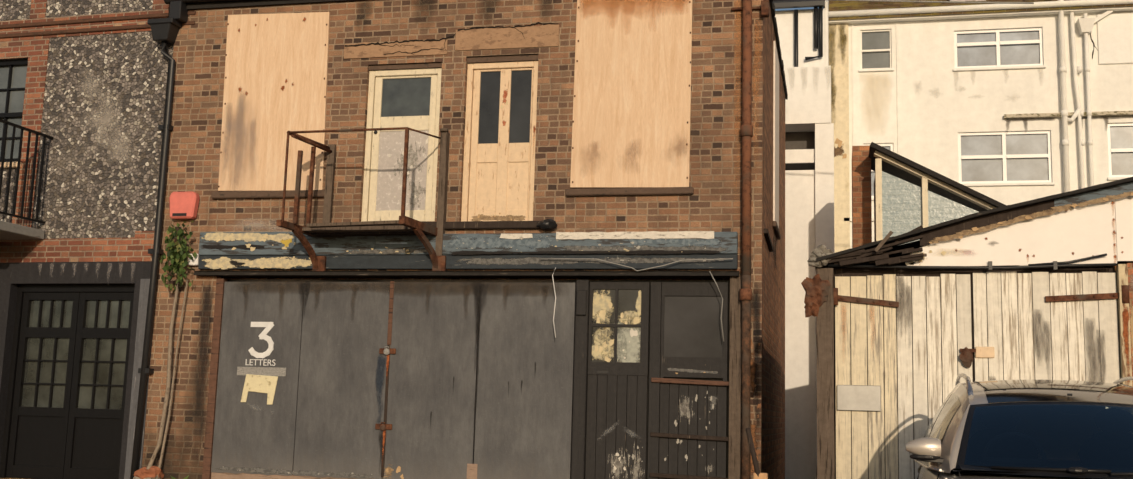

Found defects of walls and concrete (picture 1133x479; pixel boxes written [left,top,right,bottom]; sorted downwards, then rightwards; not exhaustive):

crack [345,22,558,55]
leakage [829,26,846,99]
peeling [471,213,526,221]
peeling [201,232,312,270]
peeling [448,234,728,265]
peeling [592,289,641,363]
leakage [1087,323,1104,382]
peeling [674,391,718,461]
peeling [607,441,644,479]